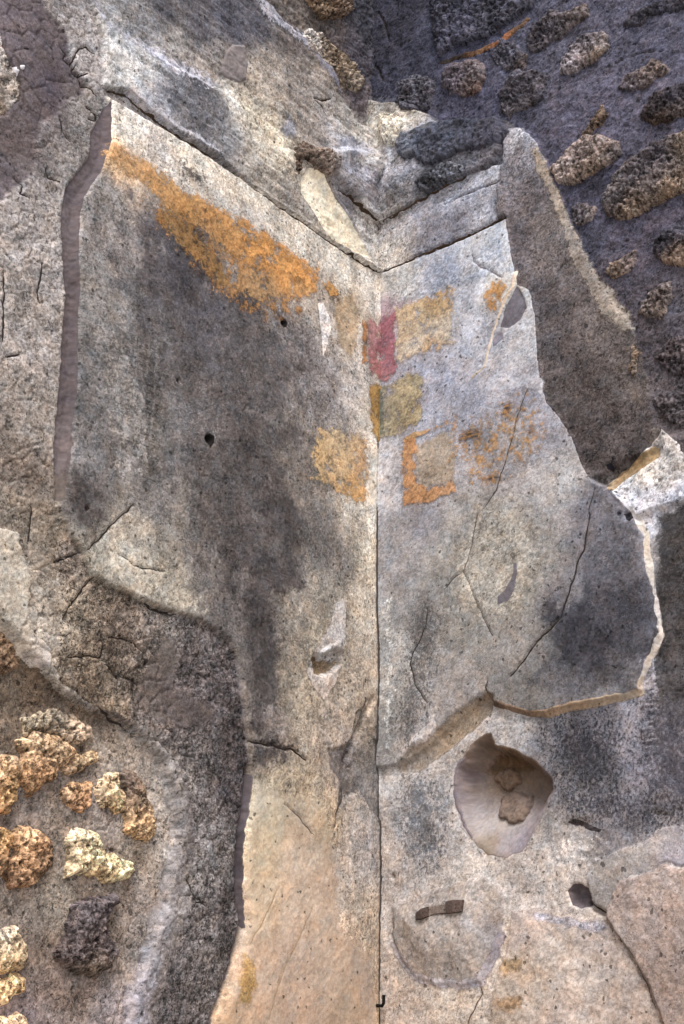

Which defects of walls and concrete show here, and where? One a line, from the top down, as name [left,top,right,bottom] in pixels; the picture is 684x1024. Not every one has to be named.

leakage [96,208,314,765]
crack [444,388,528,636]
spalling [293,0,684,858]
crack [485,487,596,697]
leakage [528,485,684,873]